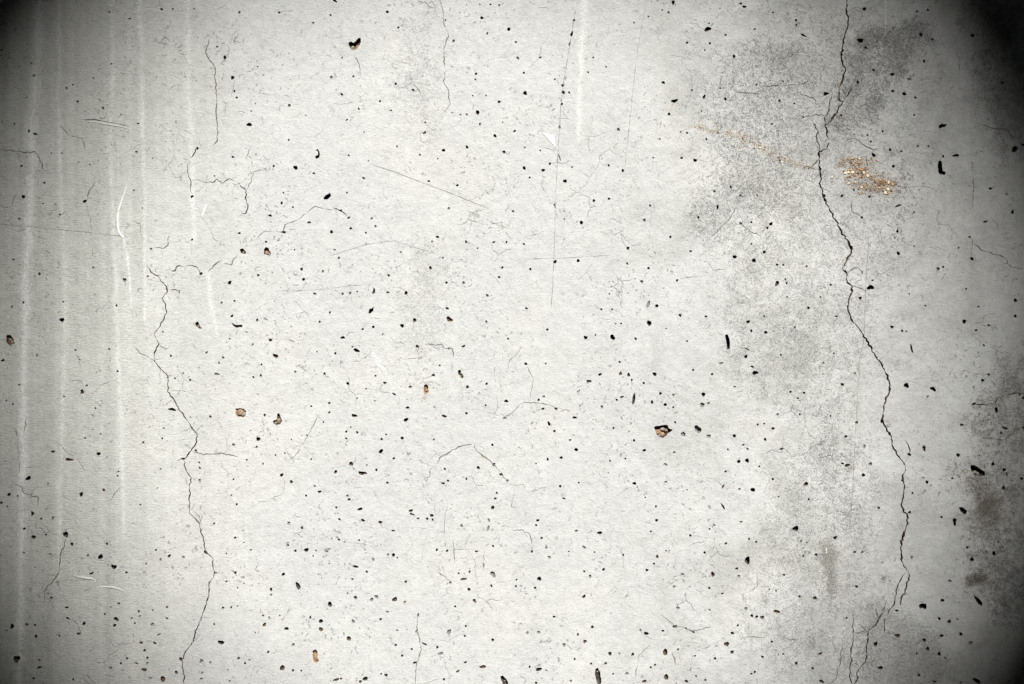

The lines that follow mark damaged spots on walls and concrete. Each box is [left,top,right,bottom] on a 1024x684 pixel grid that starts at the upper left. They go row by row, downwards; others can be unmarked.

crack [135,239,238,683]
crack [737,0,911,684]
rust [831,154,905,200]